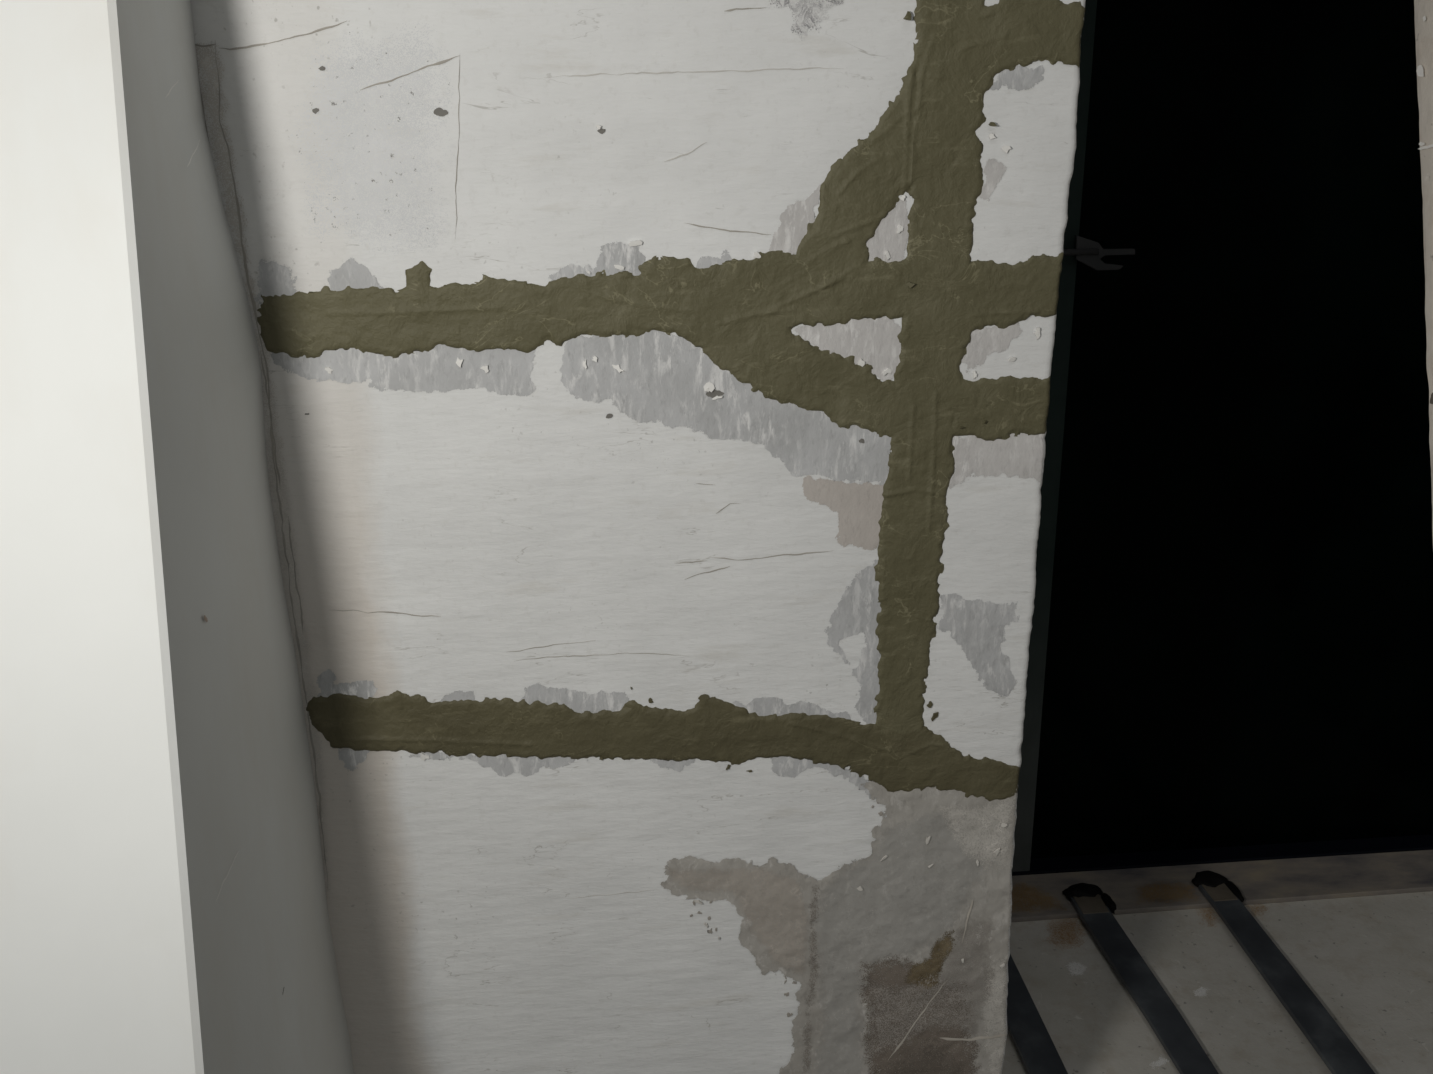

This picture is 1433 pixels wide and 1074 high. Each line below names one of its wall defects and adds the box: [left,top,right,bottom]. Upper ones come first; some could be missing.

crack [546,67,840,78]
crack [361,56,460,235]
peeling [548,240,645,281]
peeling [696,249,732,269]
crack [686,223,771,235]
peeling [793,316,901,381]
crack [195,21,434,900]
peeling [559,330,891,724]
crack [680,551,829,579]
peeling [936,593,1020,699]
flaking render [660,756,1017,1074]
water stain [857,916,998,1074]